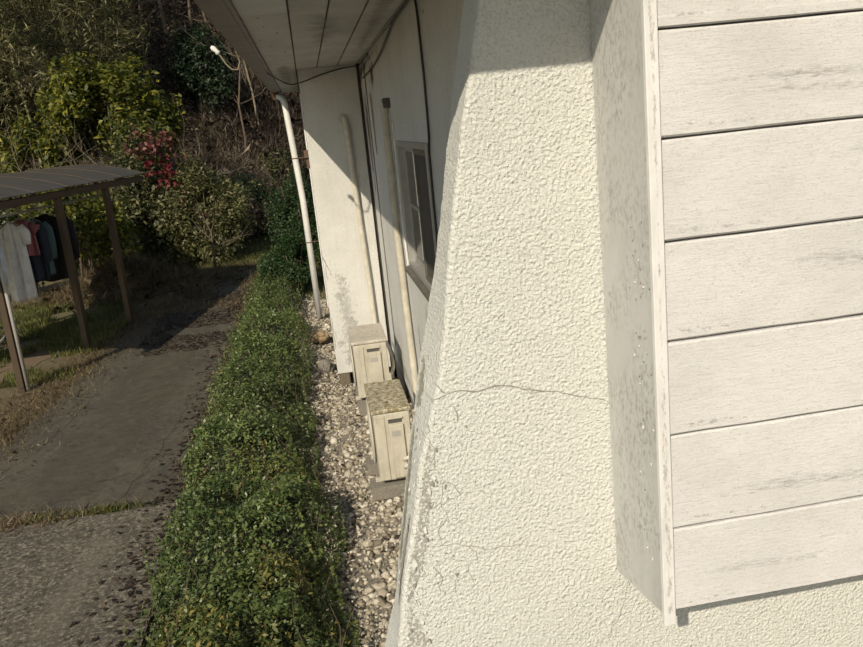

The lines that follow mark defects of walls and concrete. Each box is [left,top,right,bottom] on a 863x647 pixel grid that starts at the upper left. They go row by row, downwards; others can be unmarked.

crack [431,382,608,421]
peeling [397,441,437,647]
crack [423,422,528,592]